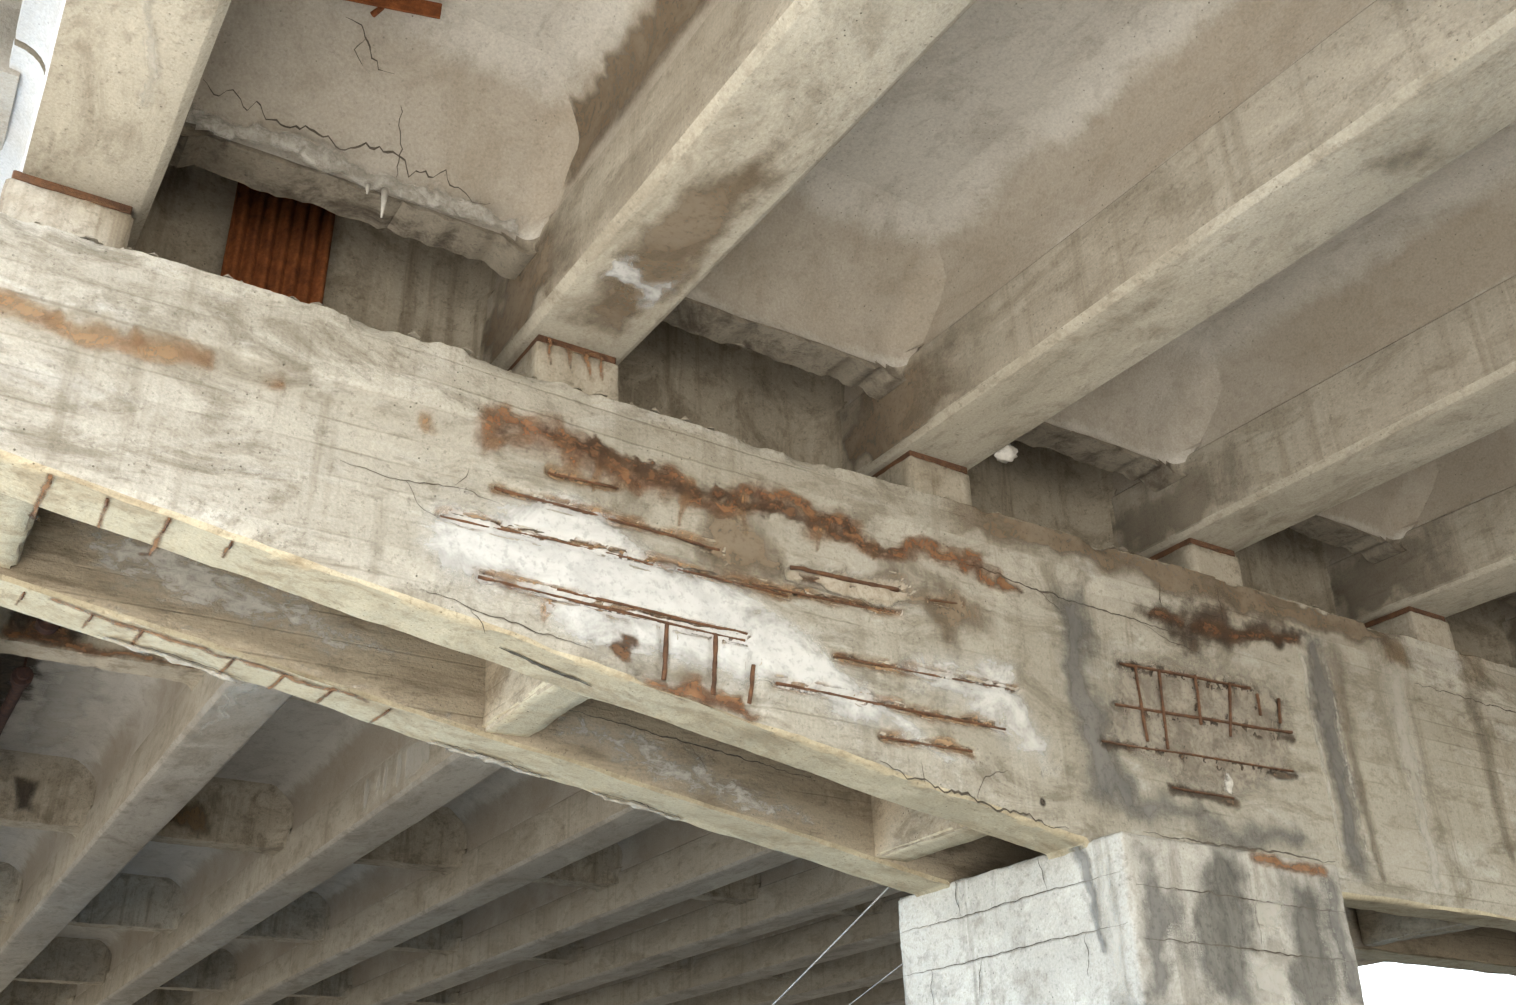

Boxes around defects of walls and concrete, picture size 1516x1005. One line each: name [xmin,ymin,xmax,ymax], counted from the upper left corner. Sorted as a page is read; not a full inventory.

corrosion [220,182,336,304]
leakage [587,163,770,332]
corrosion [139,517,171,556]
spalling [438,507,965,615]
corrosion [480,405,1023,593]
leakage [0,610,194,708]
corrosion [50,598,391,723]
spalling [475,570,757,722]
spalling [773,679,1007,757]
leakage [957,502,1405,872]
spalling [1099,660,1298,807]
leakage [1143,852,1252,1005]